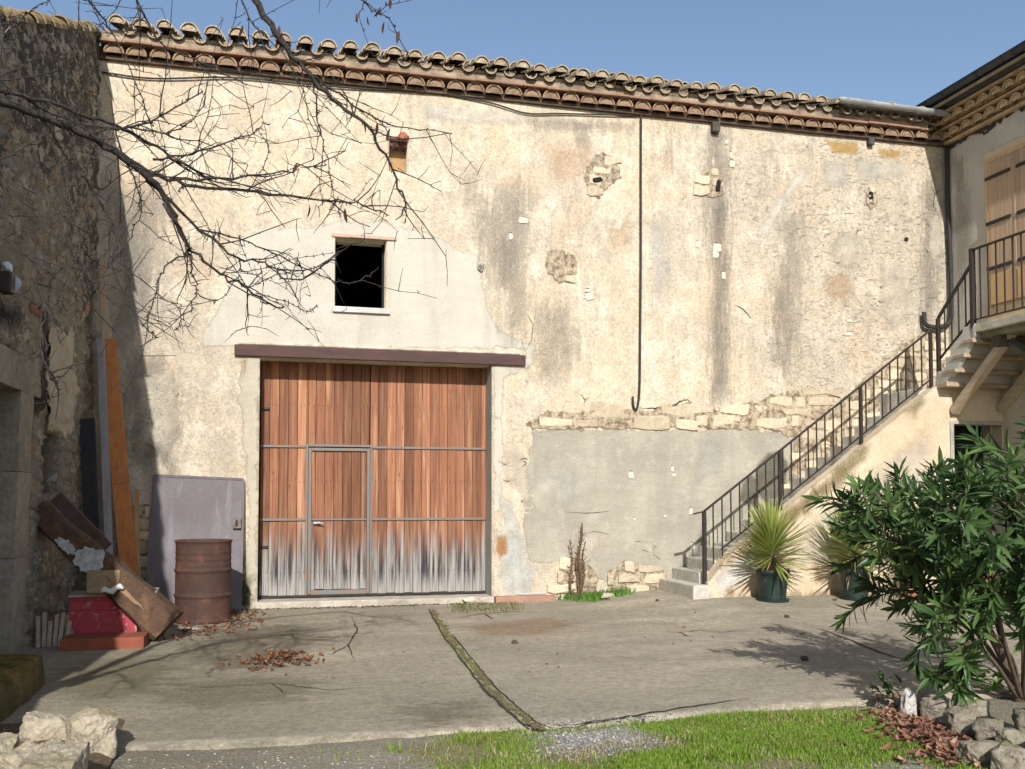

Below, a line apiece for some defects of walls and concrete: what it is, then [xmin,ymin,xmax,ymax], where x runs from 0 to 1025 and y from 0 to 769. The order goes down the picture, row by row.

spalling [584,152,622,199]
spalling [693,139,735,197]
spalling [545,249,594,301]
flaking render [526,332,950,488]
crack [332,620,358,660]